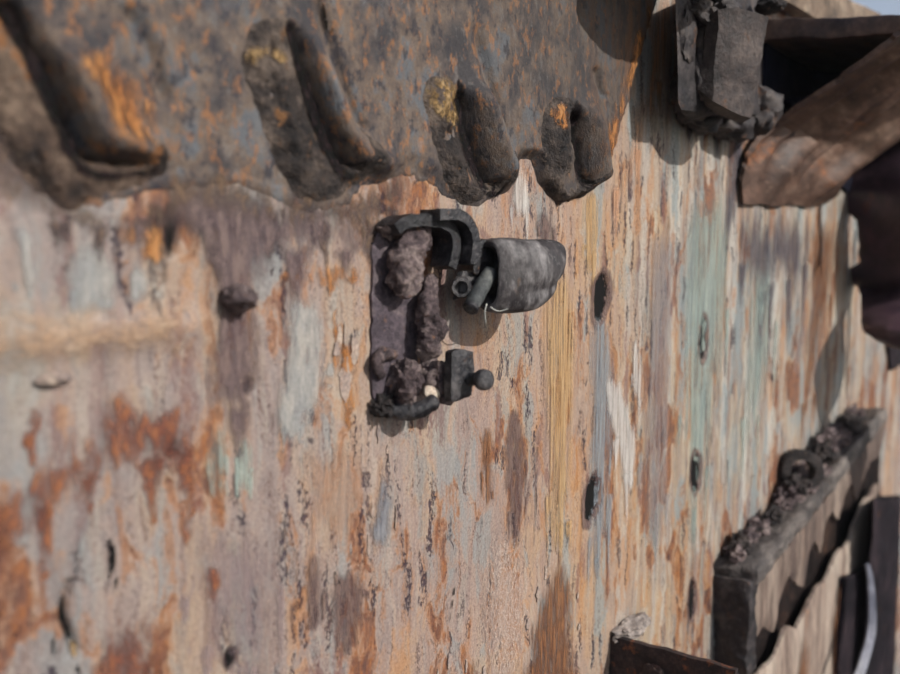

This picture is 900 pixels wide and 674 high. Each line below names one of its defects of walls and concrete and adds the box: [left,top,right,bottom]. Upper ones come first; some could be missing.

corrosion [85,54,151,139]
corrosion [0,137,105,249]
peeling [333,324,359,403]
peeling [423,385,440,399]
corrosion [0,412,102,580]
corrosion [105,397,195,541]
peeling [367,483,397,556]
peeling [526,566,581,674]